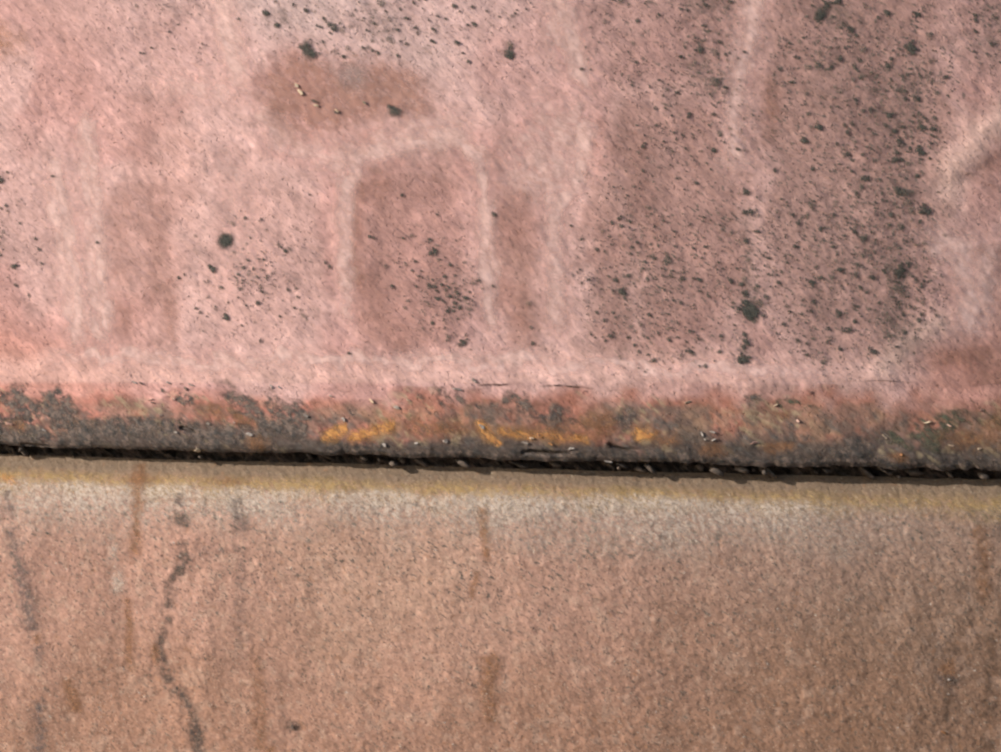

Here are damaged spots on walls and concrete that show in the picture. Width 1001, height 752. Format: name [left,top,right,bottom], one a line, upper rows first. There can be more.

water stain [34,0,1001,380]
rust [322,421,395,441]
rust [477,419,610,446]
rust [634,427,654,440]
water stain [157,543,203,752]